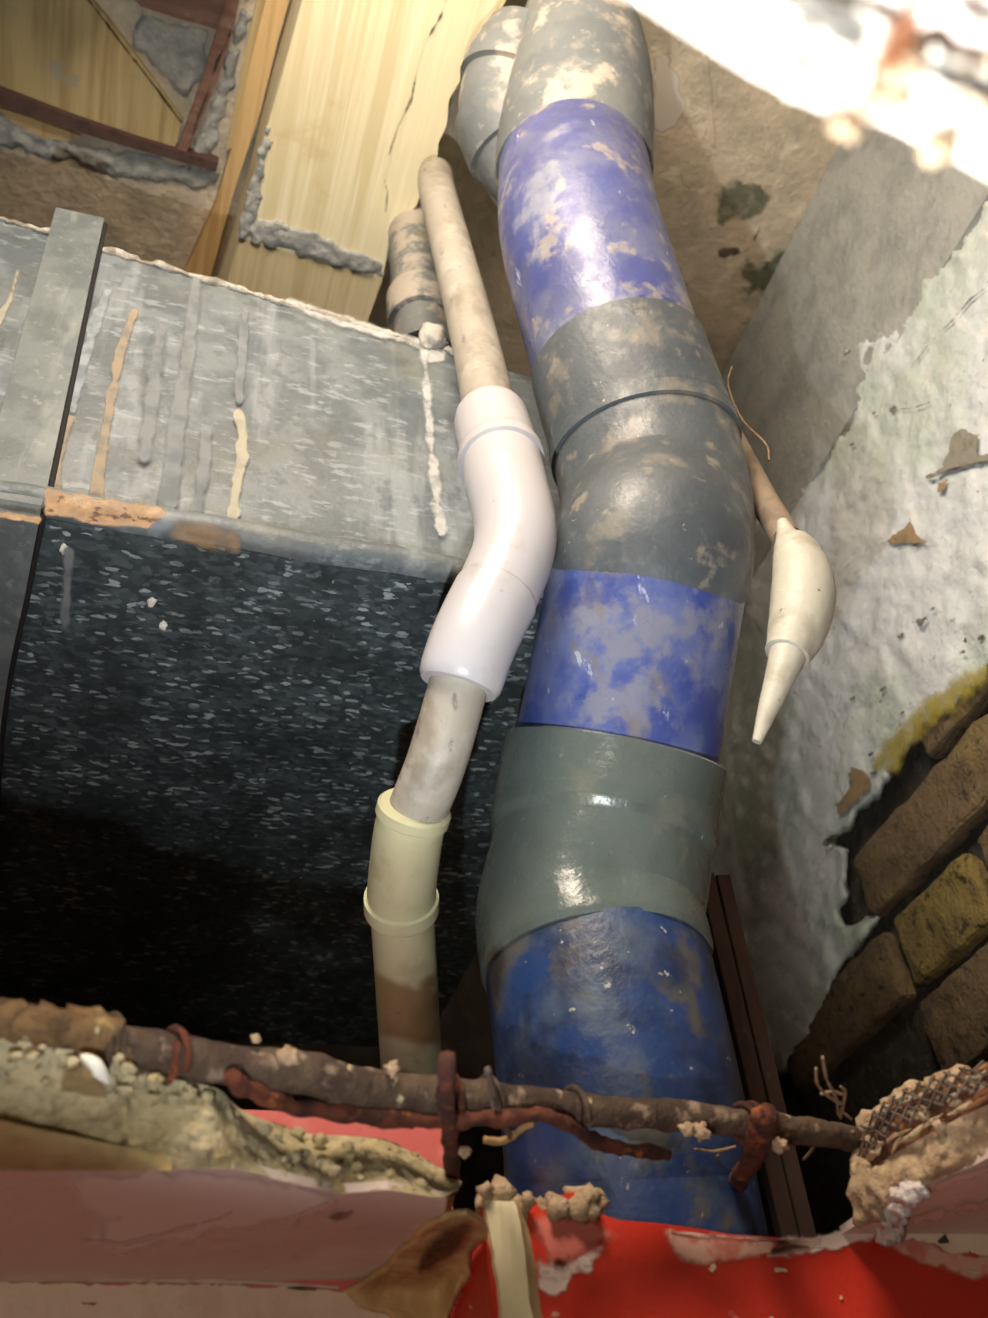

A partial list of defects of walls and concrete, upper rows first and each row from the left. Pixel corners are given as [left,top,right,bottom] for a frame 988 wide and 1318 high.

crack [390,76,416,152]
leakage [0,271,19,326]
leakage [54,289,111,489]
corrosion [0,488,166,528]
leakage [89,308,138,498]
leakage [138,276,212,513]
leakage [227,309,249,519]
flaking render [926,429,988,492]
leakage [874,666,988,772]
flaking render [667,665,988,1279]
peeling [0,1282,389,1318]
leakage [418,1224,469,1273]